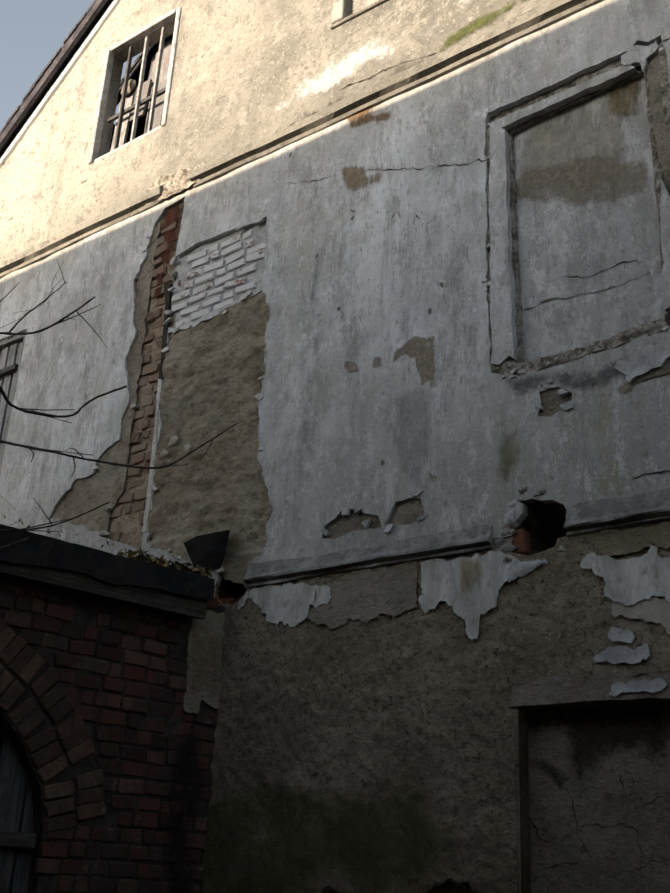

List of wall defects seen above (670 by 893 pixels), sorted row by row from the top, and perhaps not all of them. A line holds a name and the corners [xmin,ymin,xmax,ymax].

water stain [277,39,395,111]
peeling [621,36,670,153]
crack [364,159,485,171]
spalling [481,128,670,379]
crack [522,260,650,310]
flaking render [45,202,266,549]
peeling [393,336,434,388]
spalling [534,380,574,417]
peeling [216,487,575,640]
peeling [580,522,670,664]
peeling [609,678,667,697]
crack [529,770,670,877]